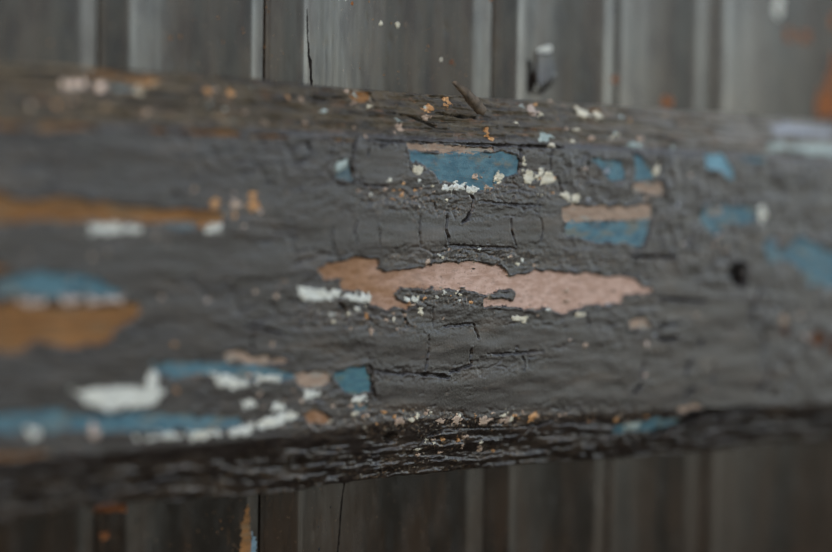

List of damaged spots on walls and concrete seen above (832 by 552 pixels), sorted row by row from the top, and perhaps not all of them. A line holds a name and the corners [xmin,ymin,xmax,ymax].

peeling [421,97,452,113]
peeling [574,106,603,120]
peeling [538,132,555,148]
peeling [407,143,556,194]
peeling [591,142,664,195]
peeling [0,191,260,236]
peeling [560,191,651,247]
peeling [0,265,140,354]
peeling [297,256,652,323]
crack [370,325,478,393]
peeling [0,350,370,442]
crack [631,407,754,447]